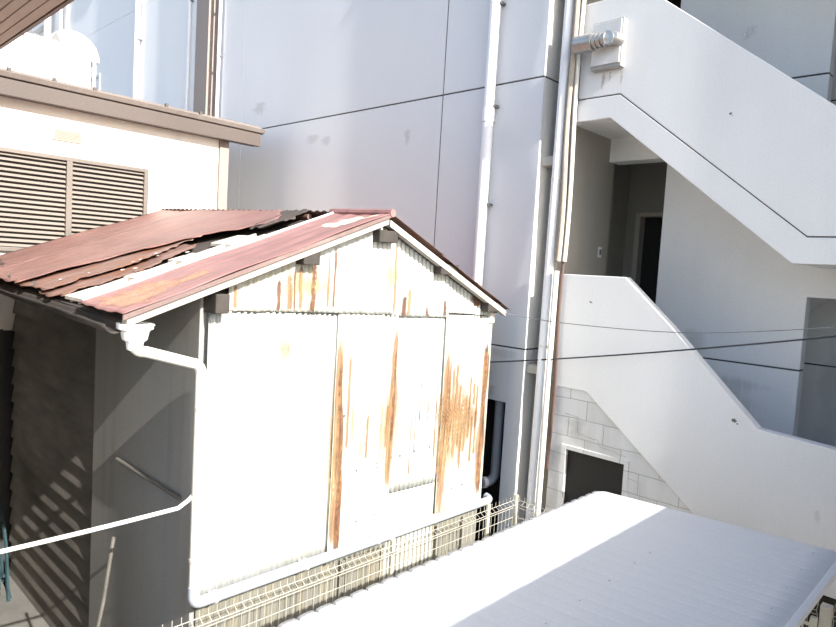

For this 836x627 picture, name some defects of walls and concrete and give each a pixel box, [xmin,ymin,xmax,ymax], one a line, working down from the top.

rust [96,270,209,307]
rust [276,251,337,311]
rust [328,341,354,549]
rust [360,330,489,509]